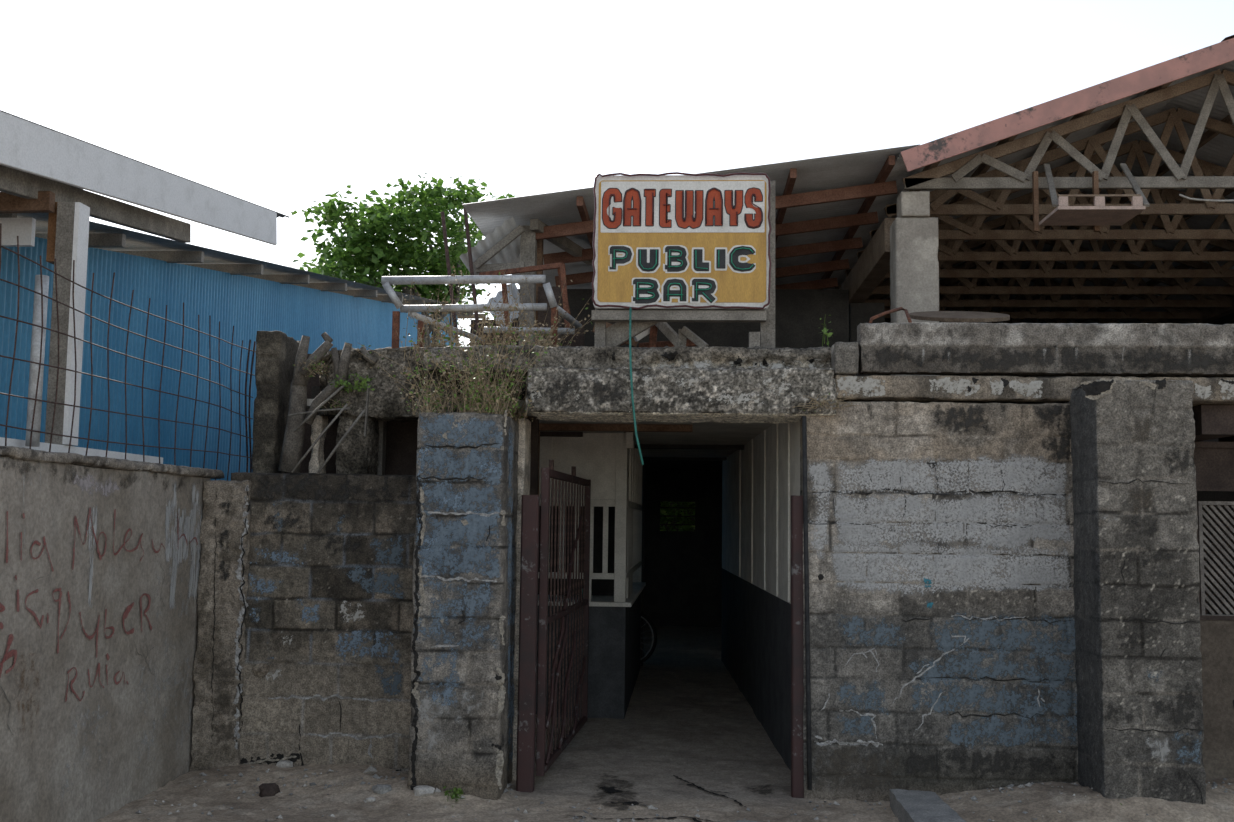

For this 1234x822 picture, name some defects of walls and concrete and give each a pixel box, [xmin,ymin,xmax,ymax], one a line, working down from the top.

flaking render [837,376,885,397]
flaking render [929,377,1043,398]
spalling [1080,377,1166,400]
flaking render [1194,379,1234,400]
damp [935,405,988,432]
damp [1035,405,1071,463]
crack [1099,477,1182,485]
crack [1111,618,1195,656]
crack [844,648,880,672]
crack [893,615,1071,736]
crack [1106,726,1196,734]